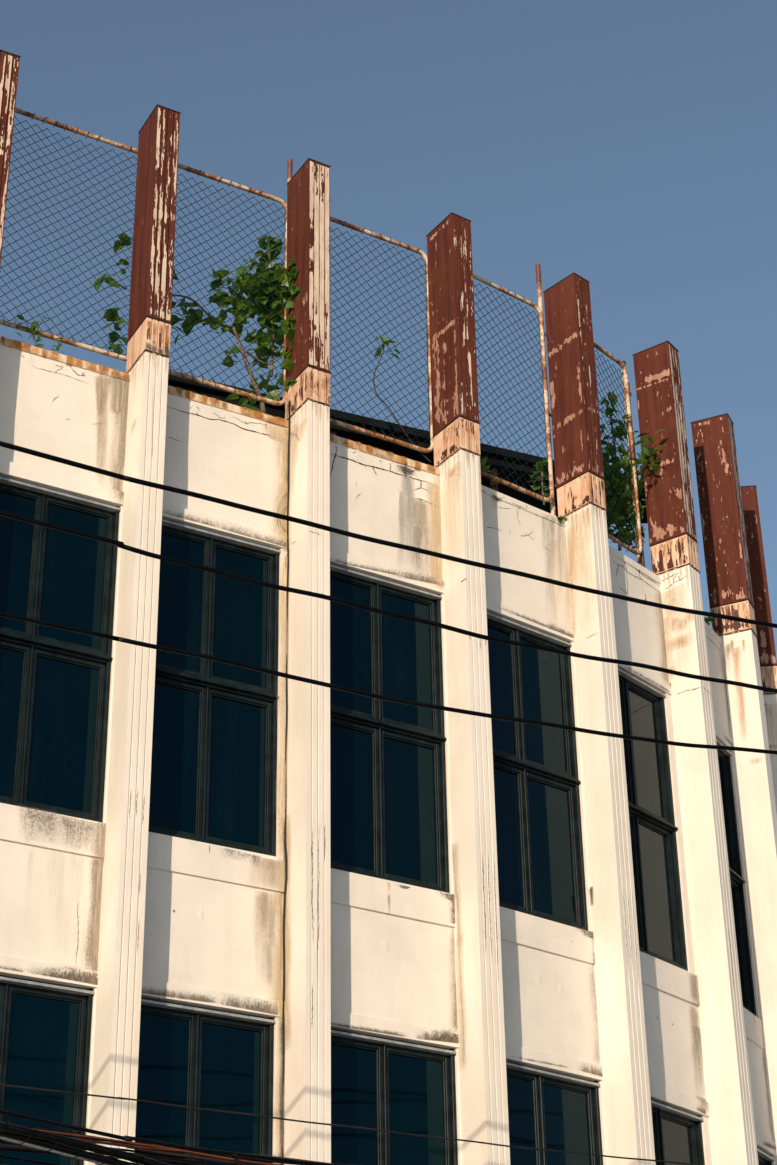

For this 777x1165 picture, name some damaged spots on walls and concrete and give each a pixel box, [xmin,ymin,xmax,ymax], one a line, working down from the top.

corrosion [1,336,129,380]
damp [96,374,130,497]
corrosion [167,387,227,409]
crack [167,406,284,442]
corrosion [243,407,285,427]
crack [330,446,438,507]
damp [337,463,444,586]
damp [41,822,106,985]
damp [142,719,290,1164]